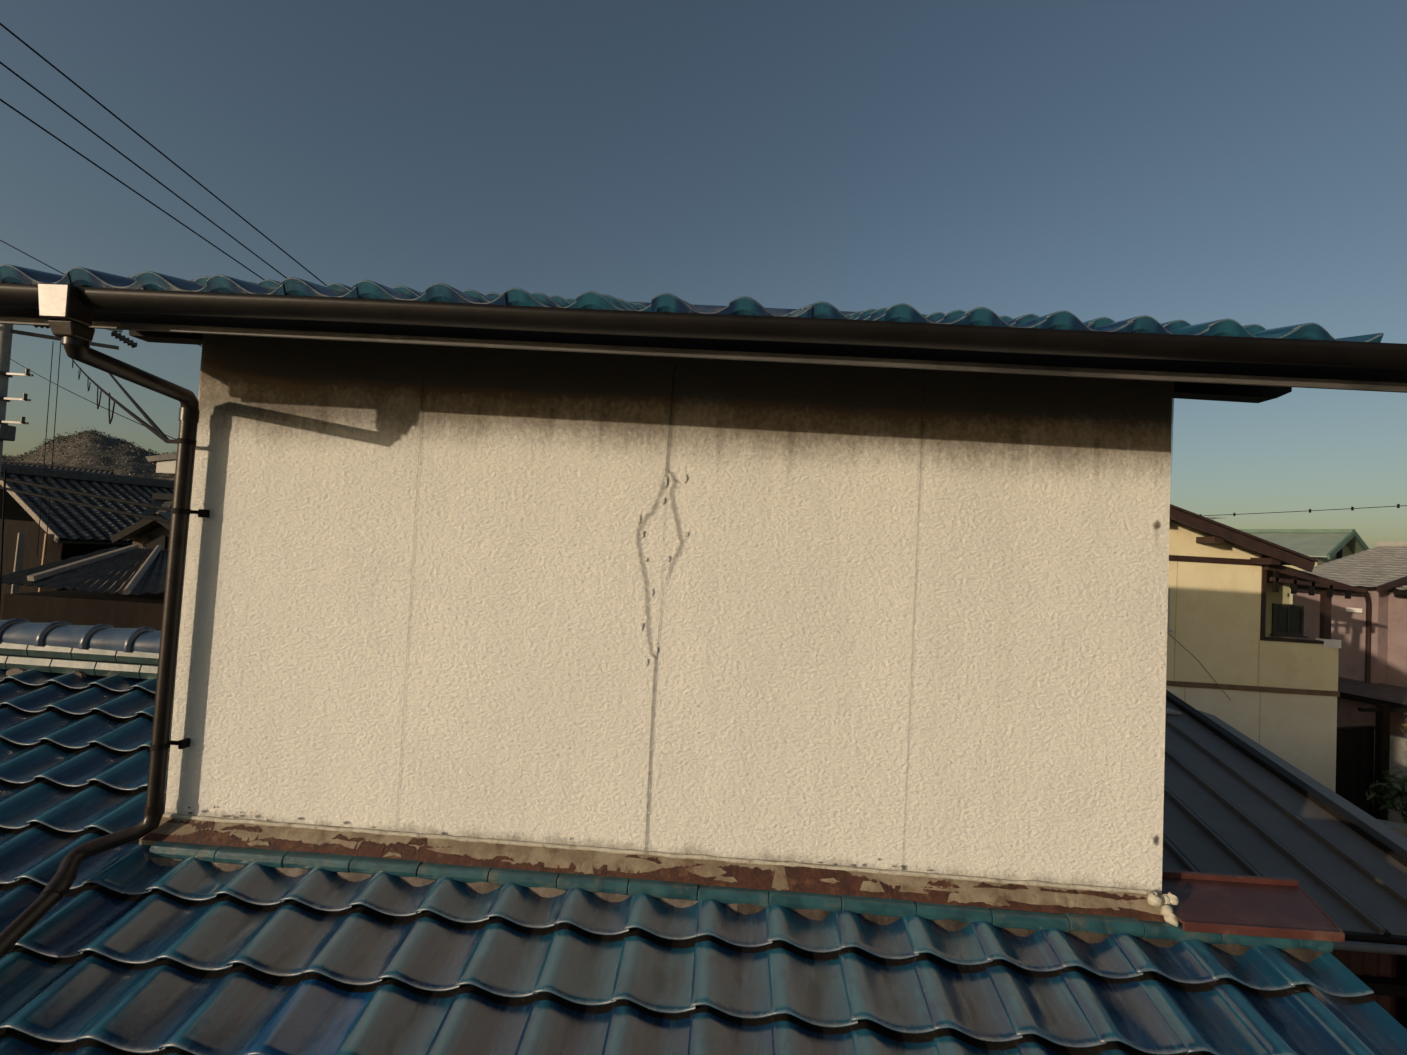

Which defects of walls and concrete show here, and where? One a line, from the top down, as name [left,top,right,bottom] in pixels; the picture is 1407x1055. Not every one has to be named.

leakage [199,334,1175,456]
crack [636,364,688,850]
peeling [575,859,594,874]
peeling [772,865,789,891]
peeling [817,859,928,894]
peeling [947,892,1010,907]
peeling [1039,898,1120,910]